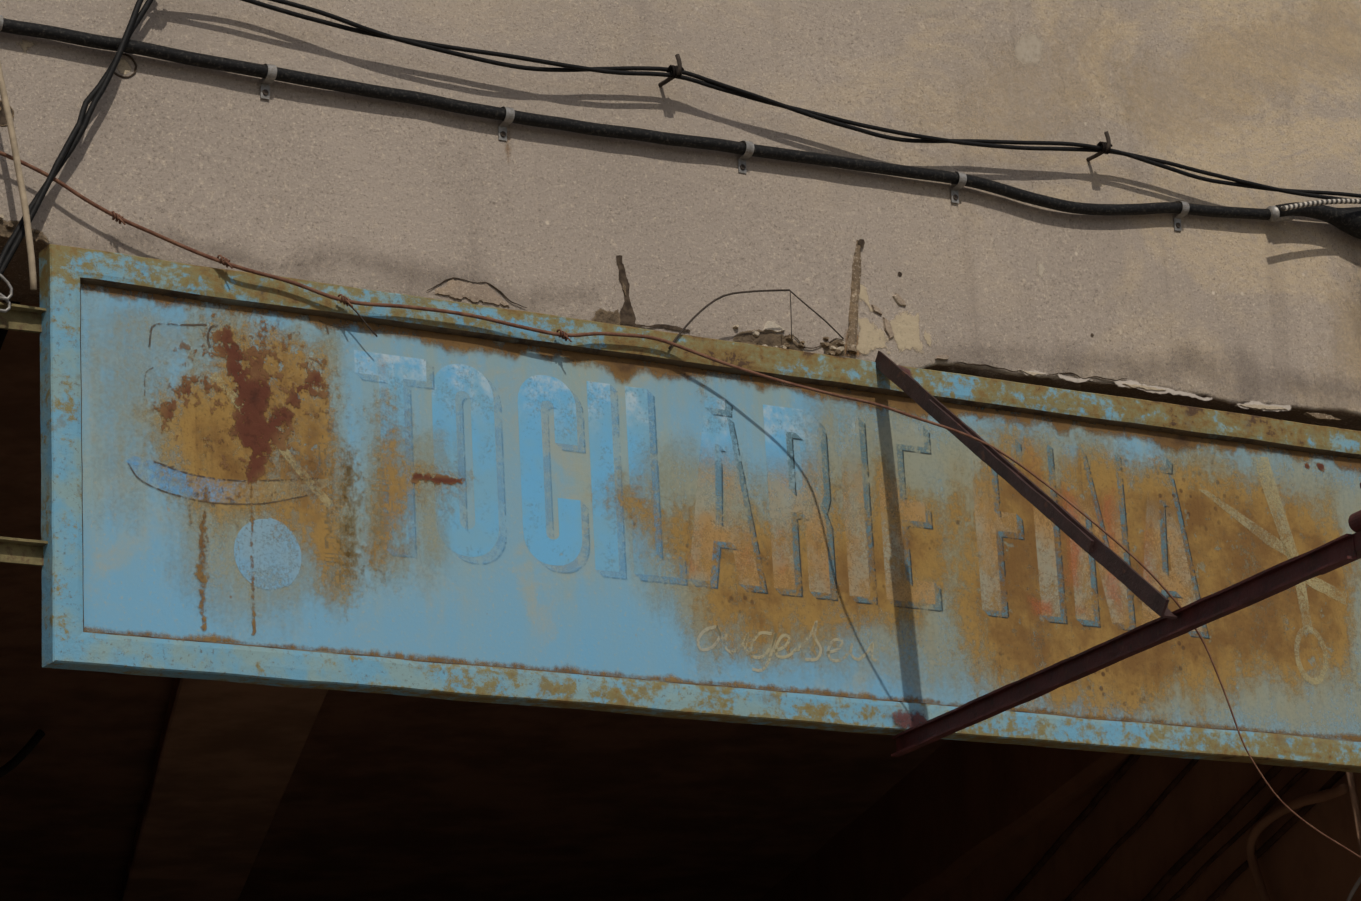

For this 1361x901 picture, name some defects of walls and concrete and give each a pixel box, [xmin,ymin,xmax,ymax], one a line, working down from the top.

peeling [592,308,620,325]
peeling [732,284,949,360]
peeling [1017,369,1092,383]
peeling [1115,380,1212,401]
peeling [1235,401,1342,421]